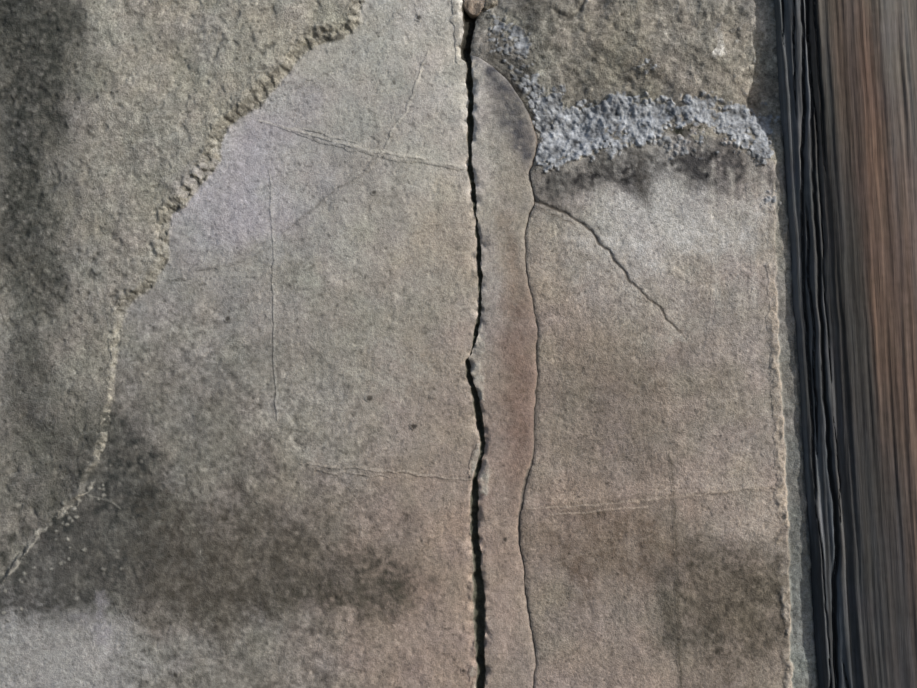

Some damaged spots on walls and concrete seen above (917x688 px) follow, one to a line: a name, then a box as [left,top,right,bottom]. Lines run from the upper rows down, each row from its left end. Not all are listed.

flaking render [0,0,366,594]
leakage [0,0,458,688]
crack [167,0,486,688]
spalling [471,318,487,404]
spalling [468,443,493,497]
leakage [503,0,564,35]
crack [518,115,700,688]
flaking render [450,0,782,147]
leakage [470,24,802,688]
spalling [766,174,776,248]
spalling [765,262,792,546]
spalling [775,562,795,688]